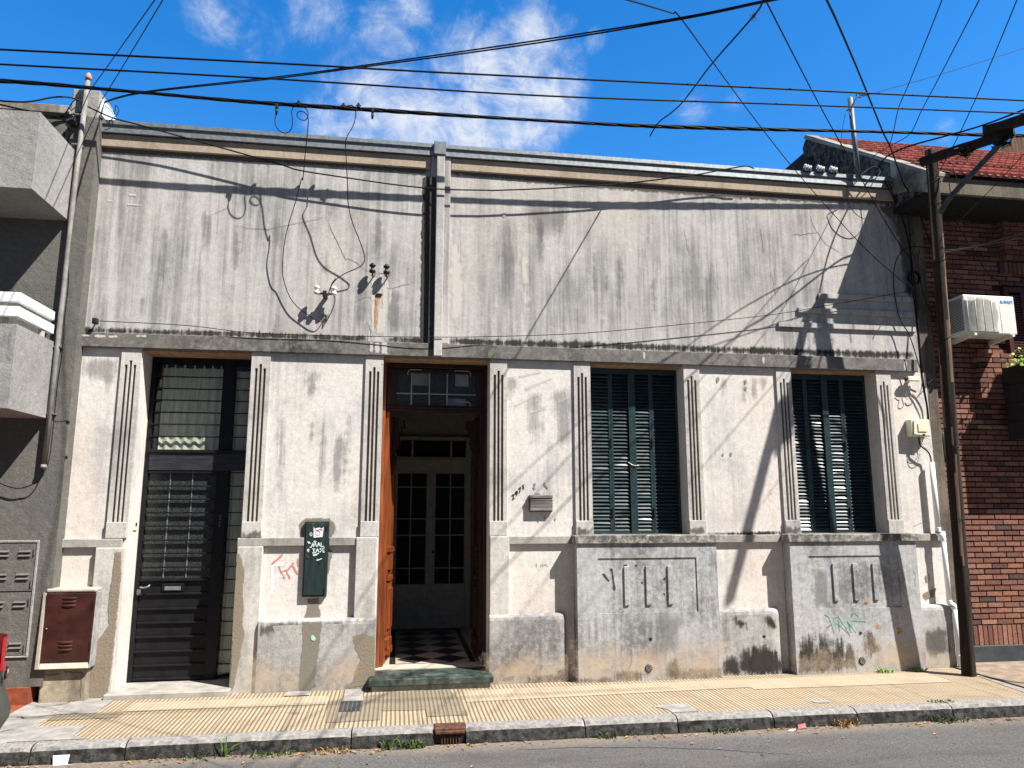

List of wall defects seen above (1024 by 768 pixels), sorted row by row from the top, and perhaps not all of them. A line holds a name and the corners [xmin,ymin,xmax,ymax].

leakage [83,147,436,354]
leakage [452,171,916,296]
leakage [450,239,463,321]
leakage [522,257,530,313]
flaking render [345,634,375,689]
leakage [581,645,784,683]
leakage [799,635,856,672]
leakage [926,627,947,663]